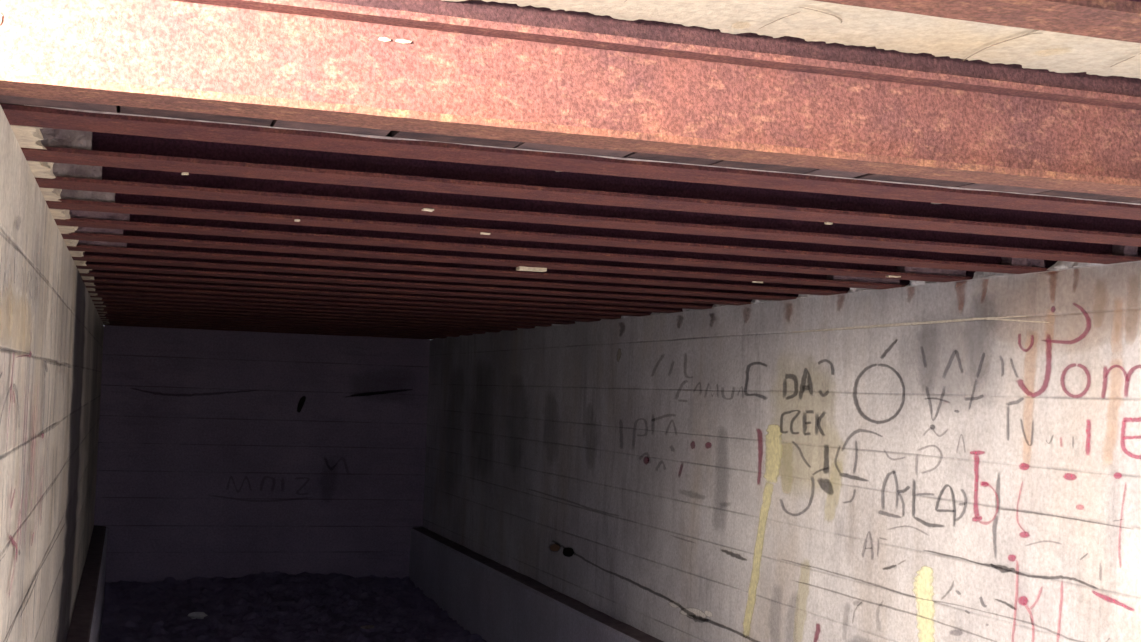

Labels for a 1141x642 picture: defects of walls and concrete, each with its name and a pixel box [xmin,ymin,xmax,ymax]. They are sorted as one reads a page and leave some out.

crack [928,551,1096,588]